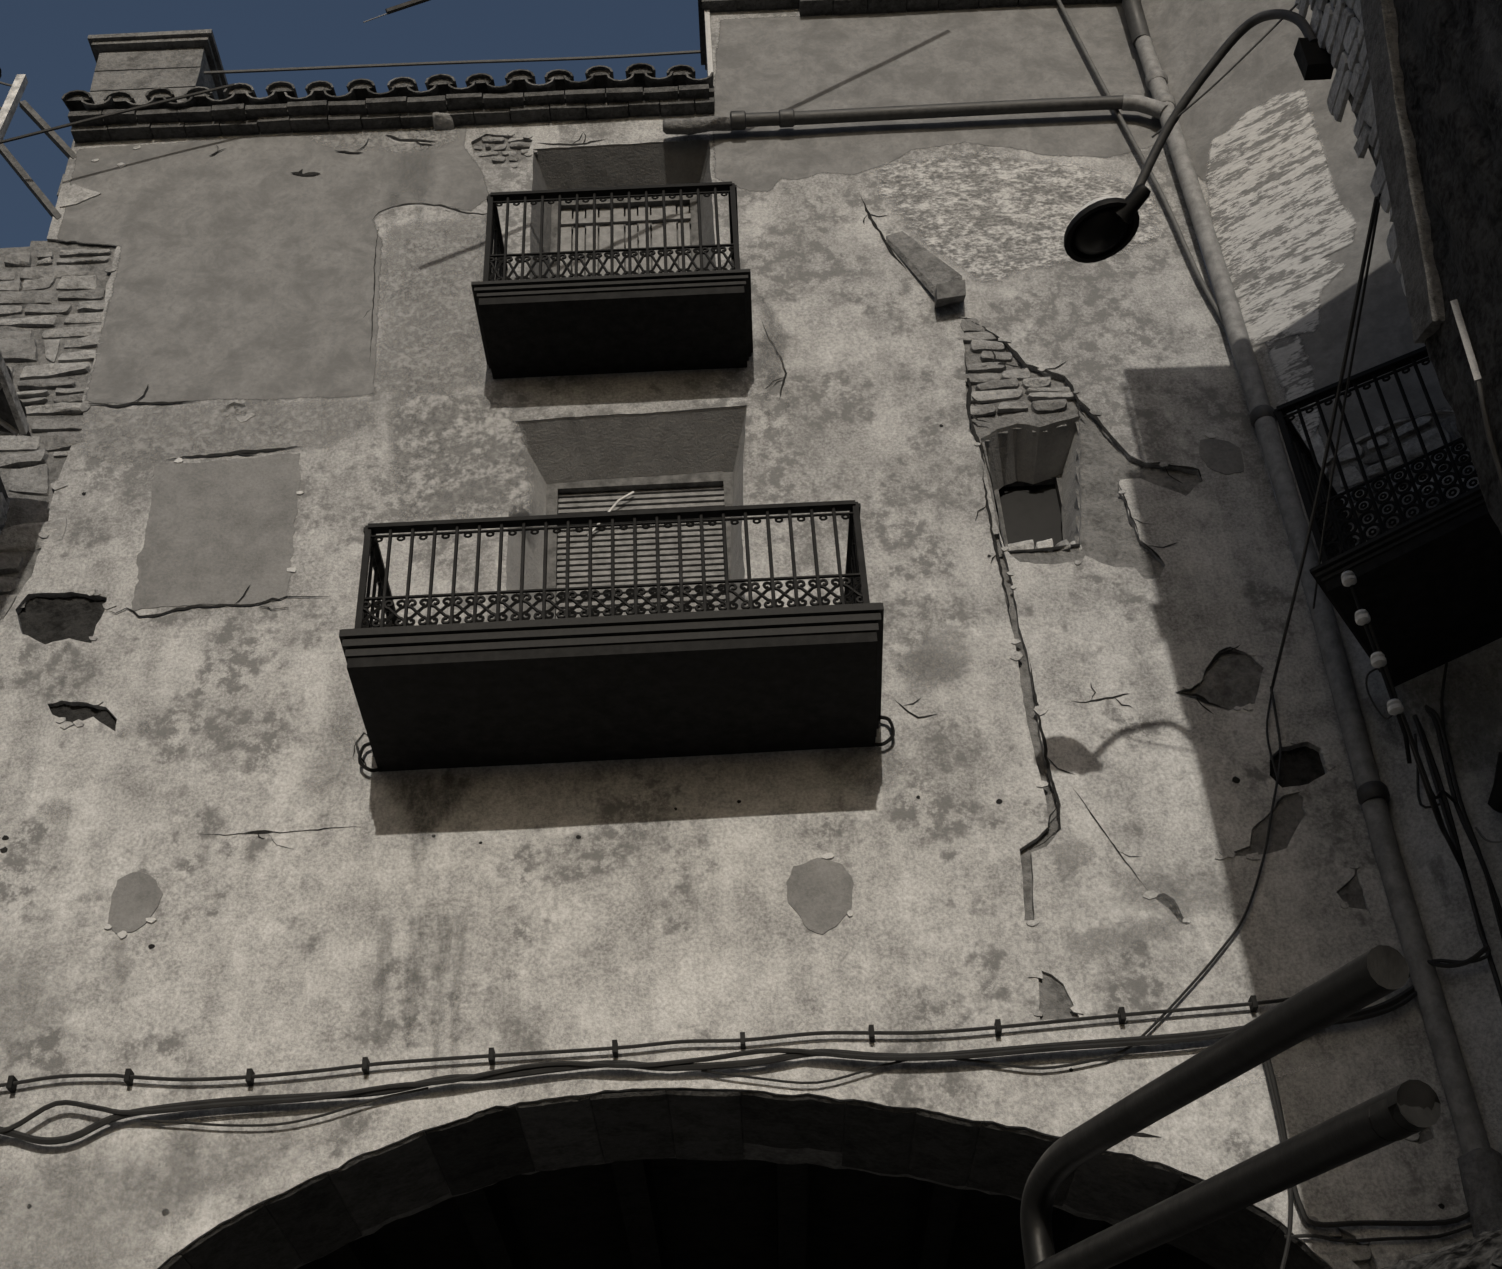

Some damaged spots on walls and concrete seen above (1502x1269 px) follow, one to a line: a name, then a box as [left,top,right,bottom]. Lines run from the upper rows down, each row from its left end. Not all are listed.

peeling [1206,0,1406,442]
flaking render [0,241,372,645]
peeling [379,218,530,517]
spalling [953,313,1201,590]
spalling [50,696,117,731]
spalling [1179,651,1263,711]
spalling [1215,737,1335,860]